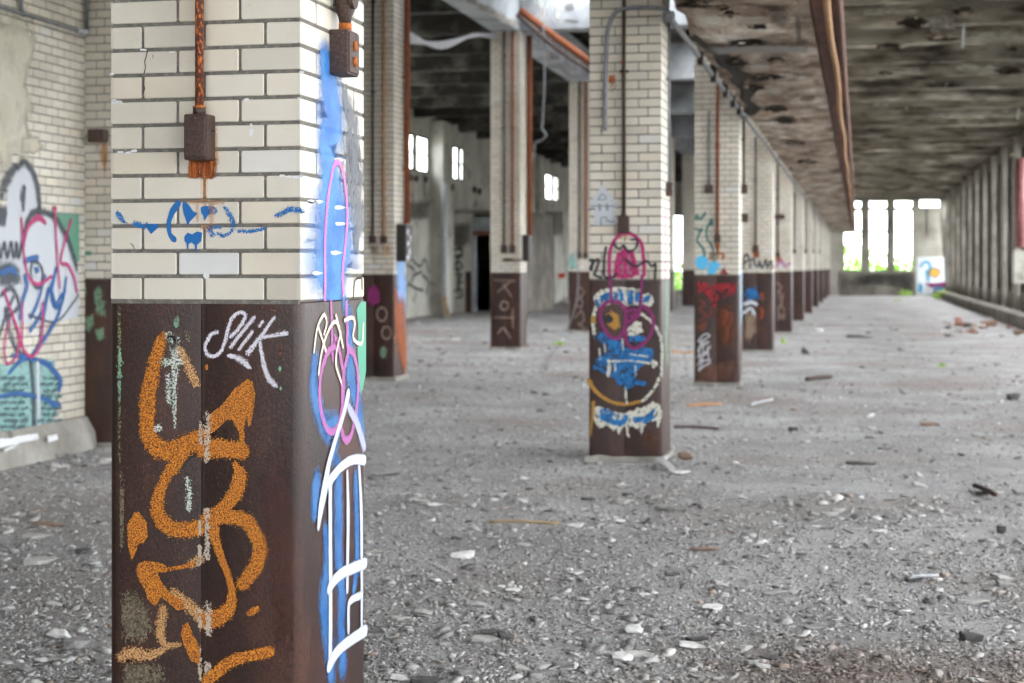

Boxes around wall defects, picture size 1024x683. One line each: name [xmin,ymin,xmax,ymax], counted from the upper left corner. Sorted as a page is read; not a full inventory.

damp [861,81,903,96]
corrosion [188,158,216,179]
corrosion [119,589,155,645]
corrosion [120,662,170,683]